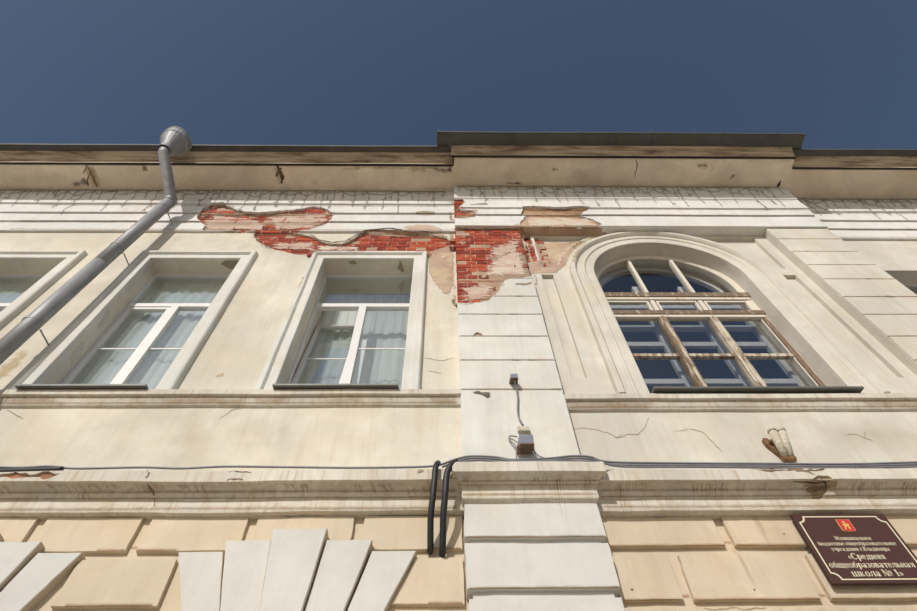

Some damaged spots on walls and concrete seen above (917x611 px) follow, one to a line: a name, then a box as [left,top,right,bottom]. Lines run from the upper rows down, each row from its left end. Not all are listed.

crack [276,166,284,184]
peeling [197,200,606,305]
crack [573,417,649,438]
peeling [804,477,838,499]